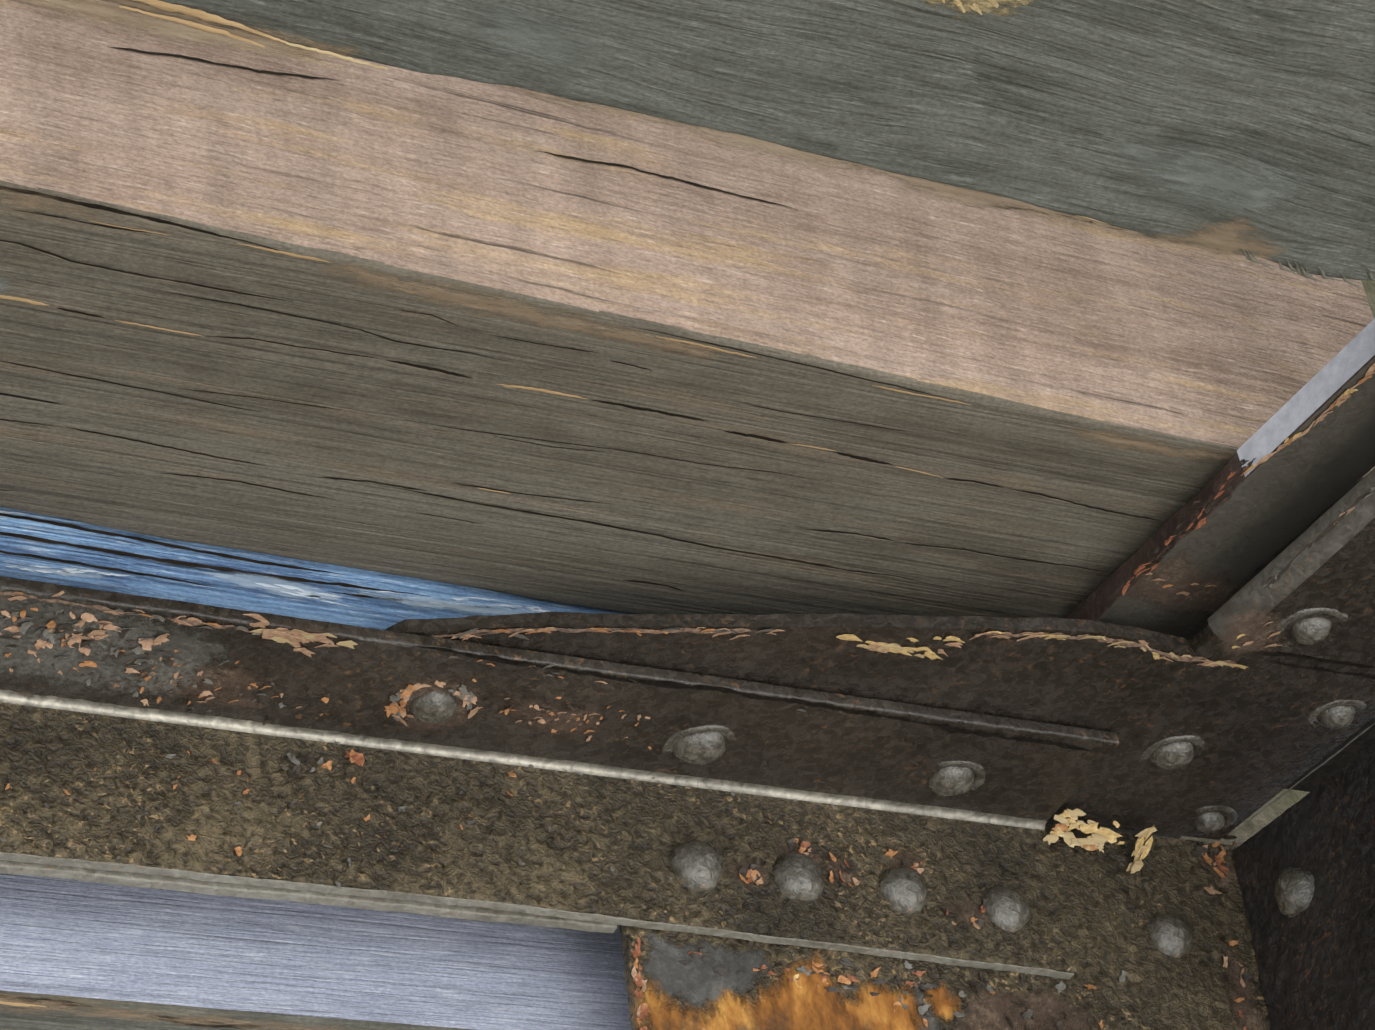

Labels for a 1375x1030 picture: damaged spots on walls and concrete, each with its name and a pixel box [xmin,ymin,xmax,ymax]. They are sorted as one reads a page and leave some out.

crack [539,151,799,211]
corrosion [1158,219,1281,262]
crack [0,186,1178,522]
crack [0,361,1104,589]
crack [0,490,517,609]
corrosion [1115,458,1282,653]
peeling [0,591,358,725]
peeling [384,660,650,741]
peeling [432,627,785,658]
peeling [836,631,1249,669]
peeling [1043,808,1157,873]
corrosion [631,937,1103,1030]